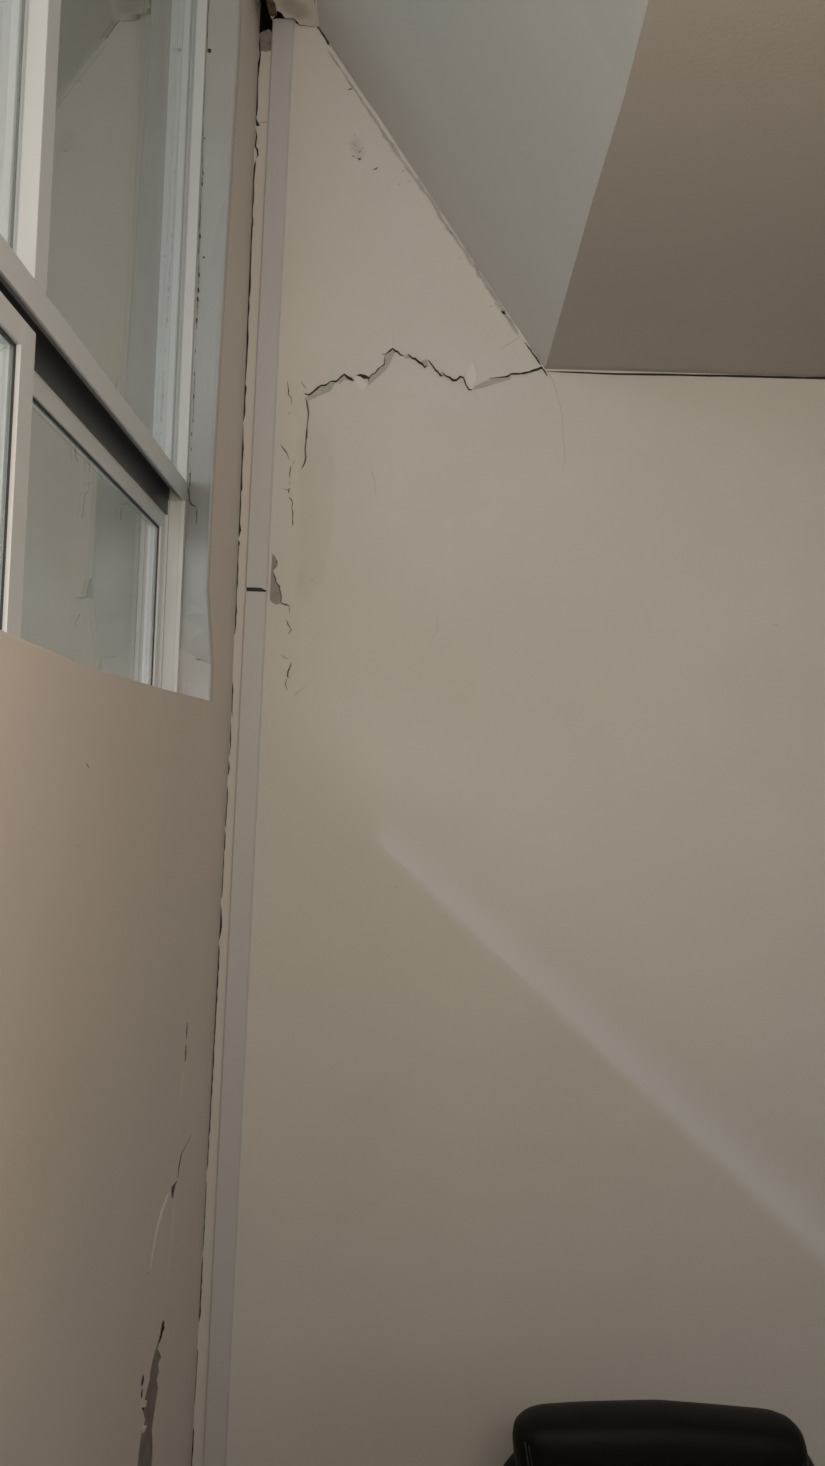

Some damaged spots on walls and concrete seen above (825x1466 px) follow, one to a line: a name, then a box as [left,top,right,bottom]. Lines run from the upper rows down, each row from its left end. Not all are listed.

crack [314,0,392,137]
crack [235,36,267,630]
crack [281,306,825,526]
peeling [270,554,290,610]
crack [171,684,233,1466]
spalling [138,1321,165,1466]